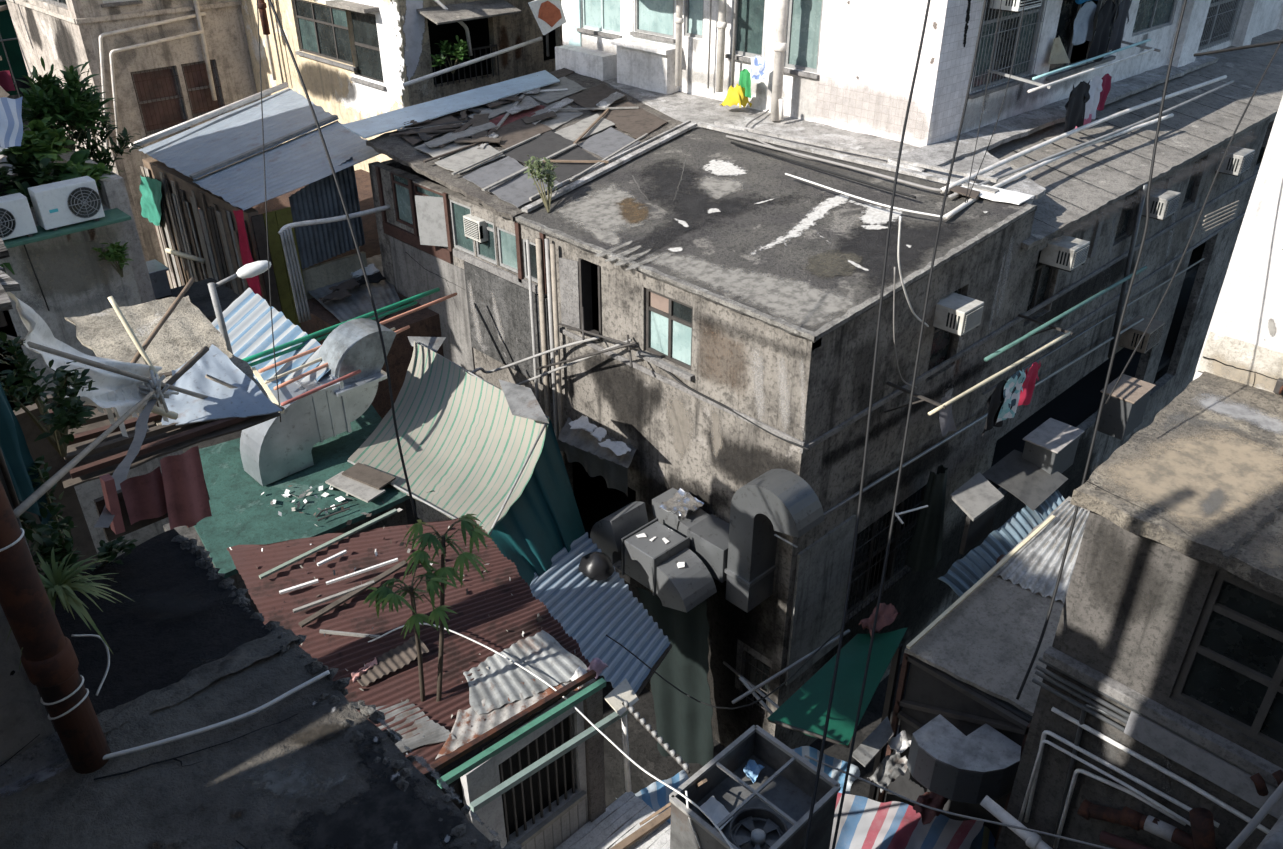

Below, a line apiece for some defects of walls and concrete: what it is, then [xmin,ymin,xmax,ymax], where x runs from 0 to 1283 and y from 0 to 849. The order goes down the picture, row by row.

peeling [341,0,425,118]
leakage [746,195,966,291]
leakage [585,356,693,456]
leakage [710,413,797,483]